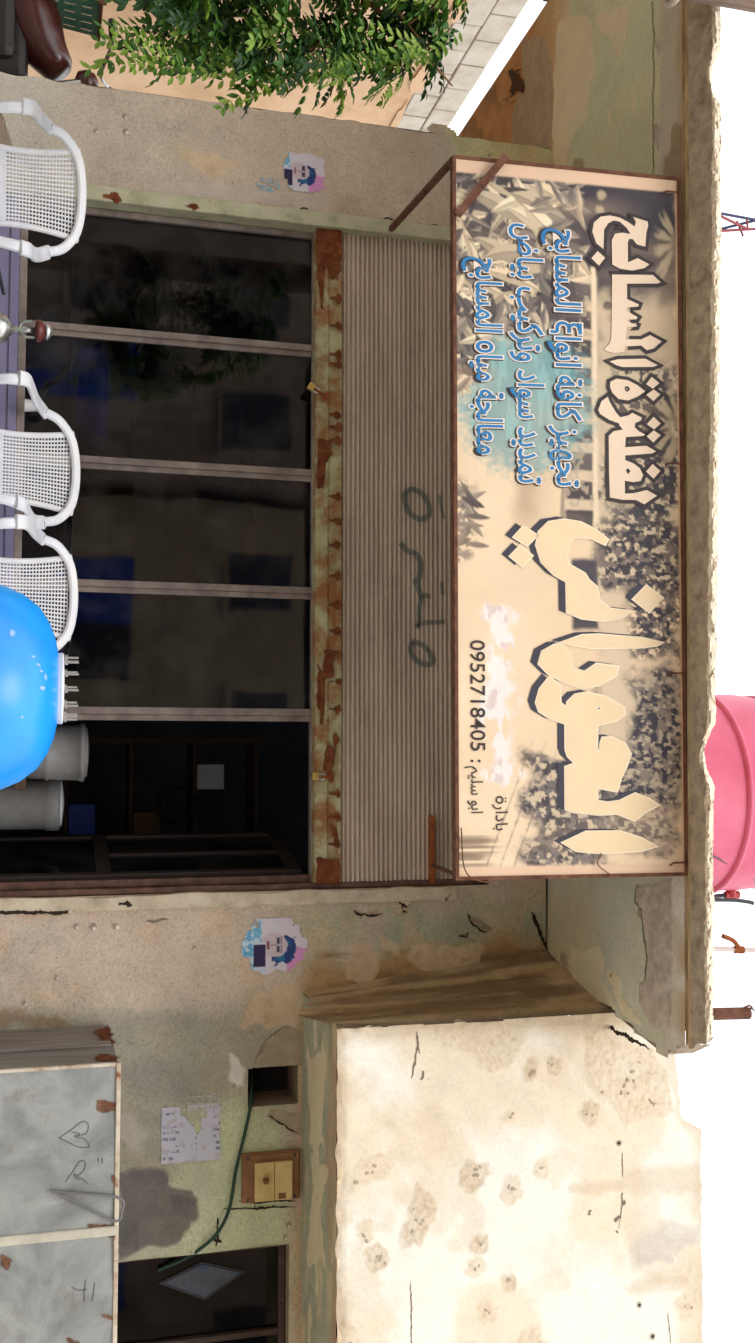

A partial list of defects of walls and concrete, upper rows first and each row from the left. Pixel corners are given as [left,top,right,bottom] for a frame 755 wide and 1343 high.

corrosion [330,350,342,369]
corrosion [316,411,343,501]
corrosion [329,518,342,549]
corrosion [316,649,342,885]
crack [531,912,559,963]
water stain [298,936,571,1027]
flaking render [568,876,676,1130]
crack [610,1025,649,1049]
flaking render [521,1054,565,1086]
flaking render [457,1156,552,1208]
flaking render [462,1232,519,1326]
crack [407,1283,415,1343]